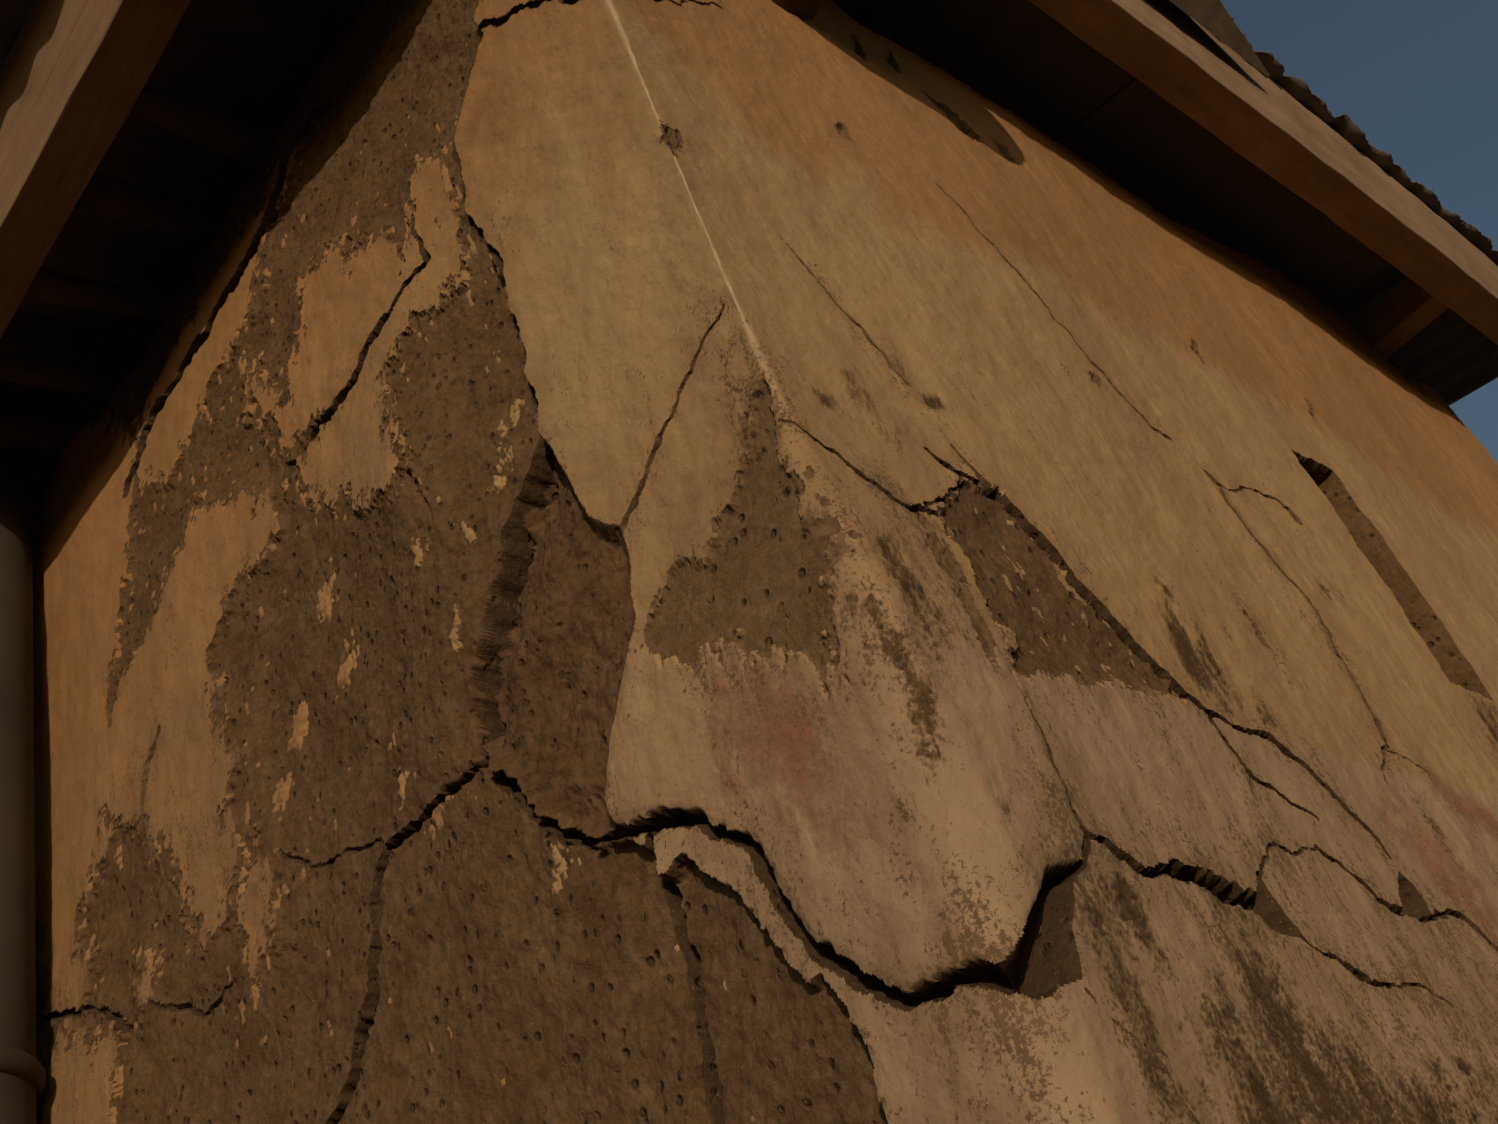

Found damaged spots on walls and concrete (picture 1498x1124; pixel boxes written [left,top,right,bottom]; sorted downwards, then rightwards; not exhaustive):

crack [478,0,580,30]
crack [654,0,723,9]
spalling [32,0,888,1124]
crack [278,74,1201,1124]
spalling [916,475,1189,705]
crack [778,418,1498,952]
crack [140,724,189,919]
crack [36,981,233,1037]
leakage [1035,839,1498,1124]
crack [1304,939,1454,1008]